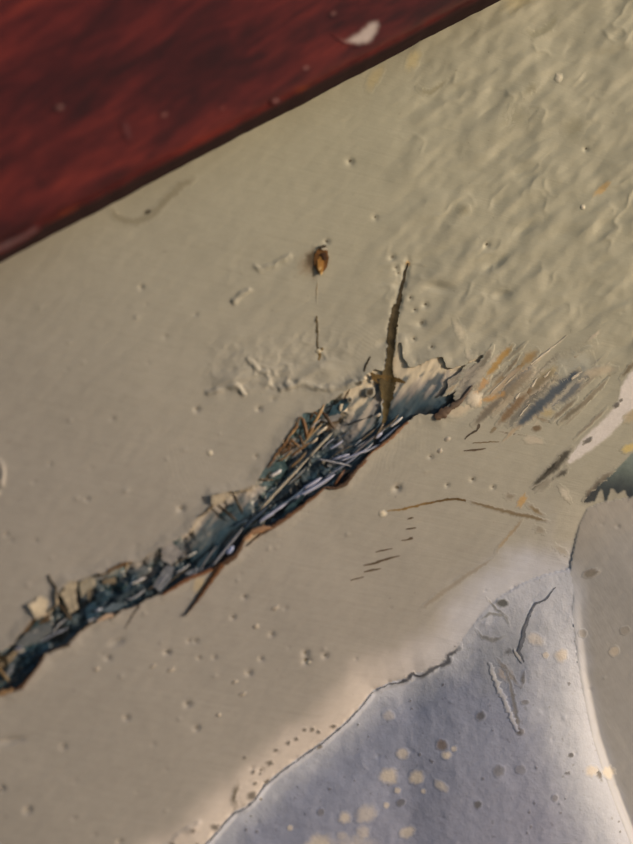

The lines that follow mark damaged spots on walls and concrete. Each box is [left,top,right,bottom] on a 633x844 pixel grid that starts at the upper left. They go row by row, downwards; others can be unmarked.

rust [292,244,329,303]
rust [314,316,324,360]
peeling [0,342,483,696]
peeling [474,611,523,732]
crack [486,587,556,688]